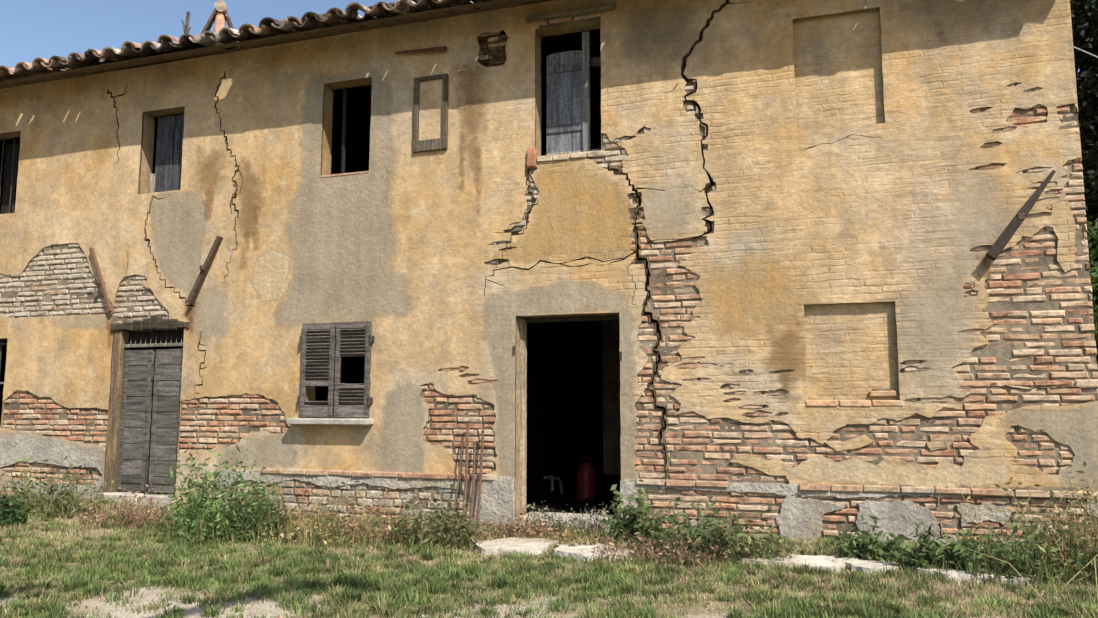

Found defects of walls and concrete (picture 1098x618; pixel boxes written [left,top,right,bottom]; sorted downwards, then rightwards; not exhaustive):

crack [107,86,128,168]
spalling [683,82,708,150]
spalling [981,104,1079,148]
crack [215,72,243,281]
crack [483,0,746,478]
spalling [0,243,169,323]
spalling [627,158,1098,547]
spalling [1,390,108,446]
spalling [179,393,290,452]
spalling [421,366,498,474]
spalling [2,461,102,486]
spalling [226,479,471,523]